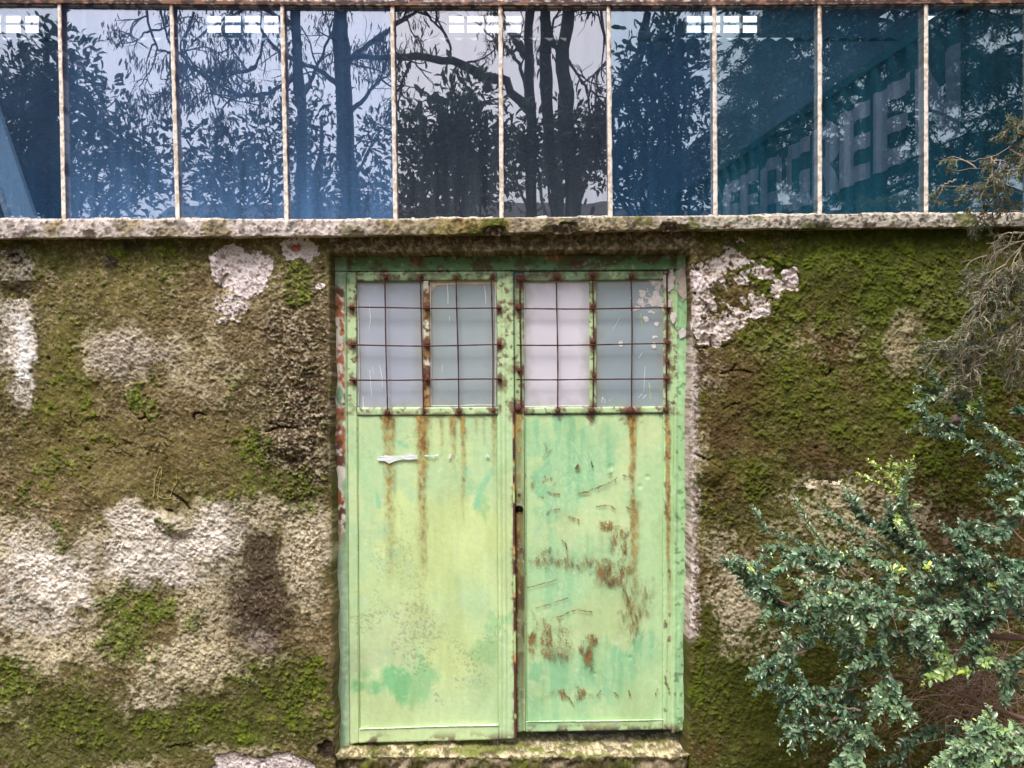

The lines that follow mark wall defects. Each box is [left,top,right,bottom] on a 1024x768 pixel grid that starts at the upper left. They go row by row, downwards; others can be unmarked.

spalling [208,238,320,326]
spalling [689,237,799,348]
corrosion [383,416,395,517]
corrosion [416,416,465,511]
corrosion [536,415,648,635]
water stain [0,502,323,650]
corrosion [528,619,598,672]